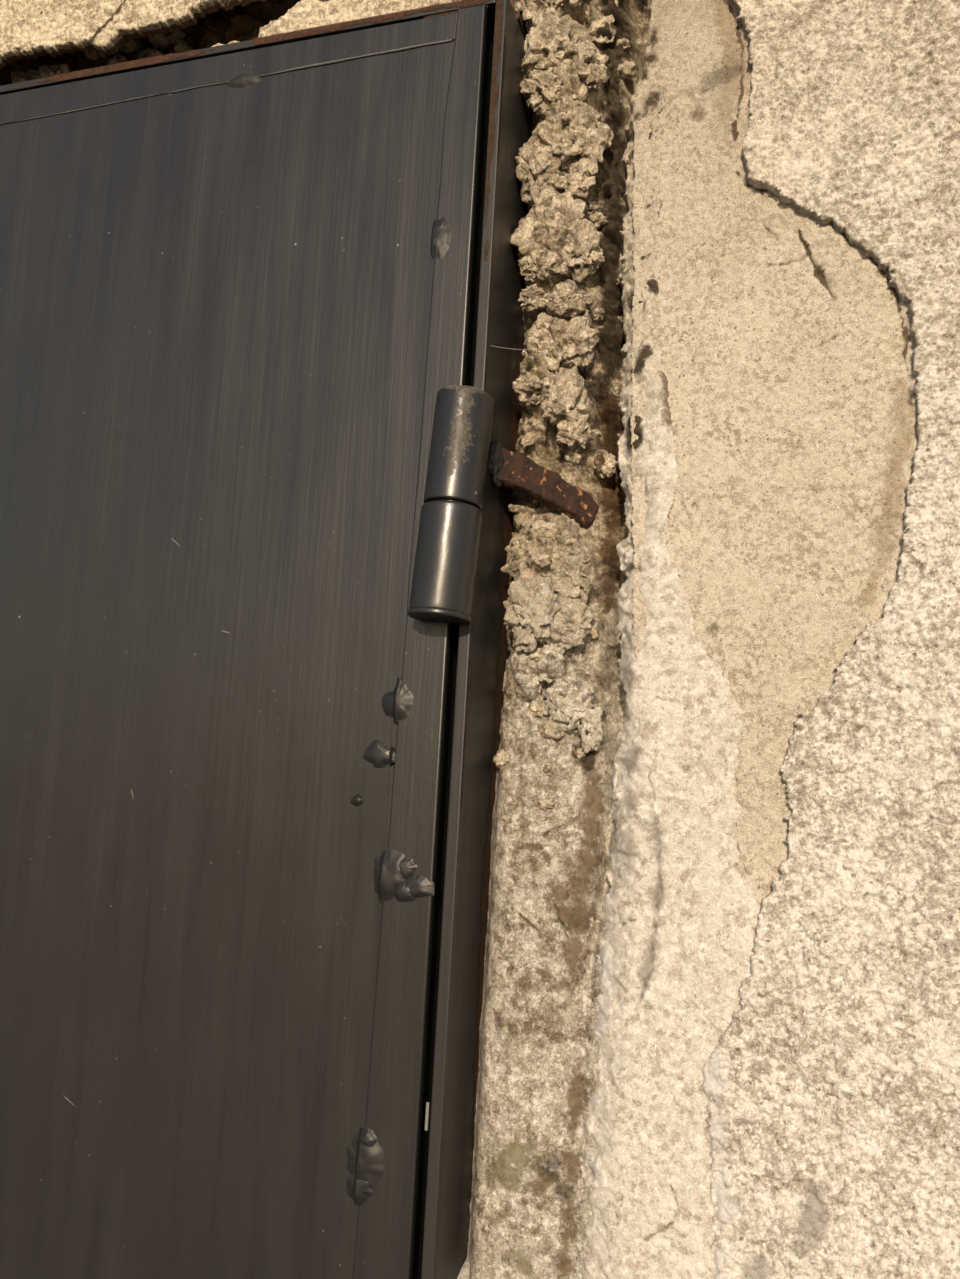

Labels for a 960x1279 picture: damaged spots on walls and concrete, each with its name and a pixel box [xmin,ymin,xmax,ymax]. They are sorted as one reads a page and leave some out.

crack [0,0,301,86]
crack [510,0,529,40]
crack [724,0,744,141]
crack [736,172,772,197]
crack [766,228,833,298]
crack [841,233,910,362]
flaking render [467,0,918,1279]